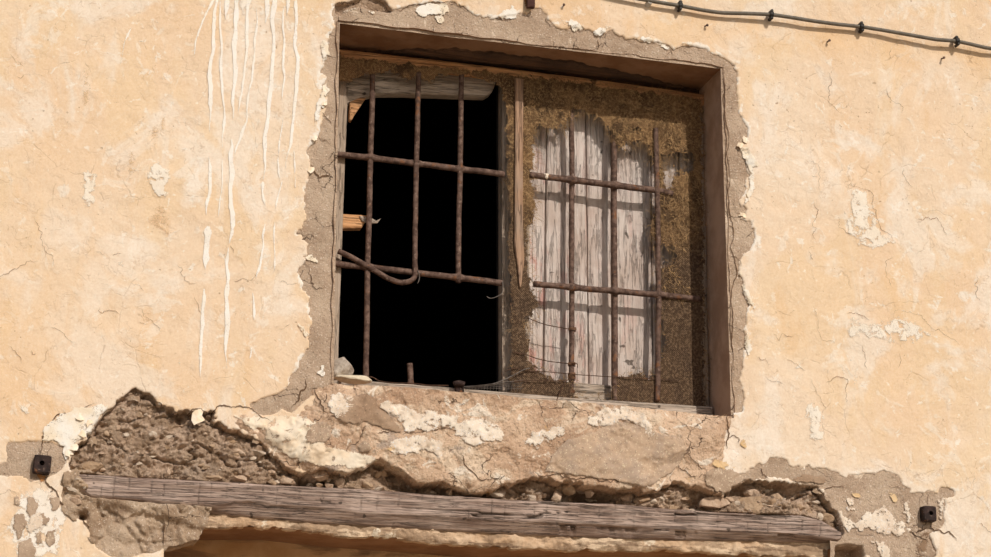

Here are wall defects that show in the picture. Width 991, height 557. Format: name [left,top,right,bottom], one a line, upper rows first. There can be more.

peeling [147,162,170,197]
damp [194,0,300,363]
spalling [250,0,758,415]
peeling [847,189,896,249]
peeling [847,316,931,342]
peeling [805,402,824,440]
spalling [0,404,212,557]
crack [538,473,628,485]
spalling [731,458,954,557]